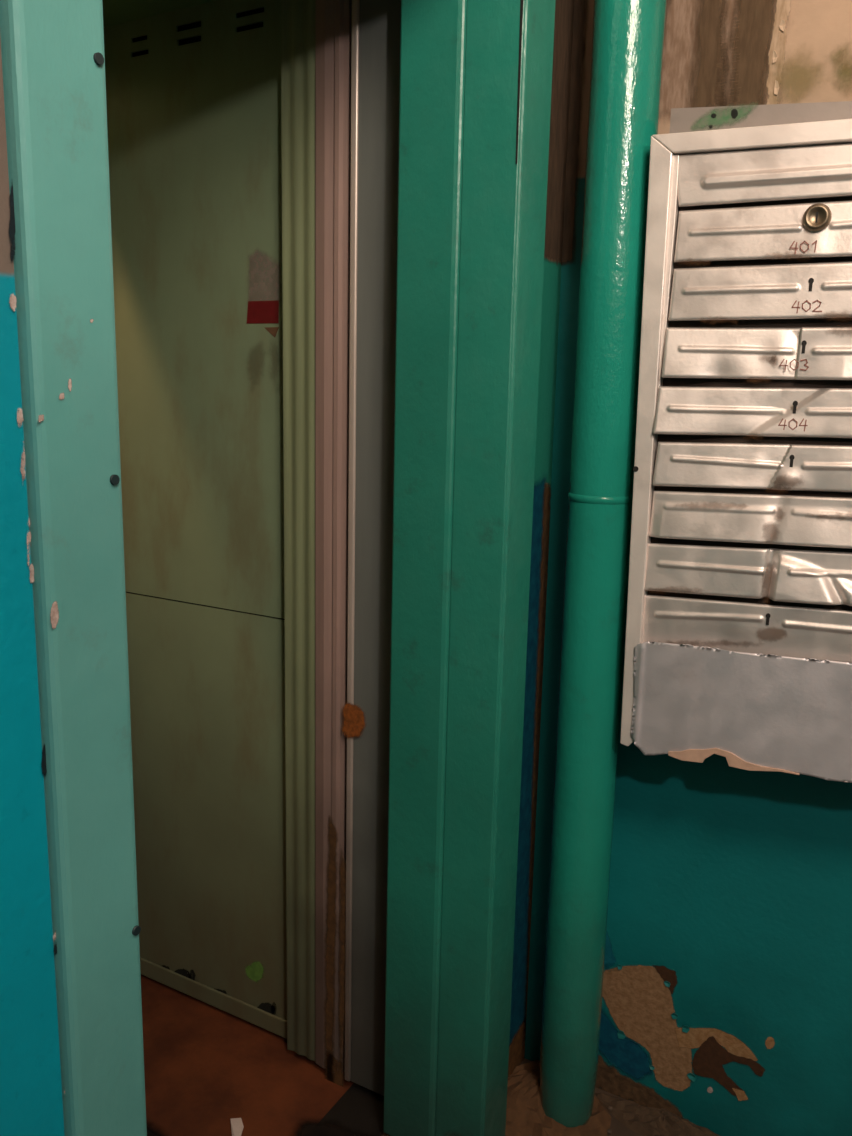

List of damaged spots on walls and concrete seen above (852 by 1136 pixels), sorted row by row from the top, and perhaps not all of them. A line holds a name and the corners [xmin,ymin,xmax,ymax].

leakage [659,0,777,117]
corrosion [342,703,366,738]
peeling [595,964,765,1118]